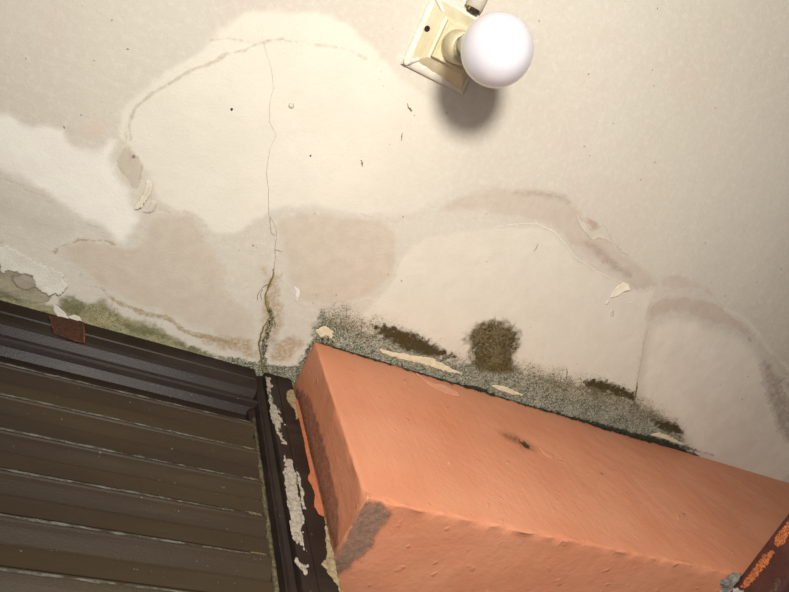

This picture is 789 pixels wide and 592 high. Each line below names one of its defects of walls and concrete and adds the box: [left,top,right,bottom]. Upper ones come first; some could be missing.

crack [257,39,281,374]
peeling [0,245,82,321]
corrosion [49,315,85,343]
peeling [379,348,462,397]
water stain [469,320,518,373]
peeling [492,385,523,396]
water stain [758,353,789,444]